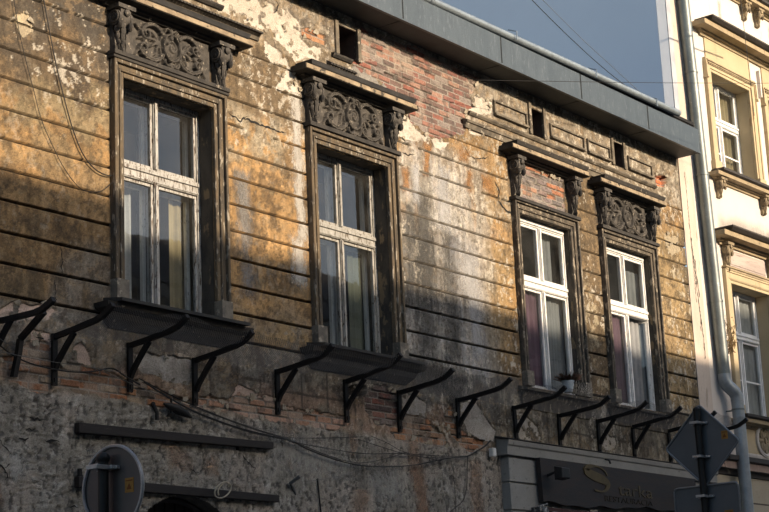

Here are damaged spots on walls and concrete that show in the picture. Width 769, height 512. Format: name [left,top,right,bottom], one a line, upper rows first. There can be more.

flaking render [15,11,34,37]
flaking render [211,0,324,94]
flaking render [351,28,493,150]
flaking render [520,167,565,212]
flaking render [0,299,54,321]
water stain [408,168,435,356]
water stain [438,170,484,360]
flaking render [0,330,349,432]
flaking render [364,385,495,452]